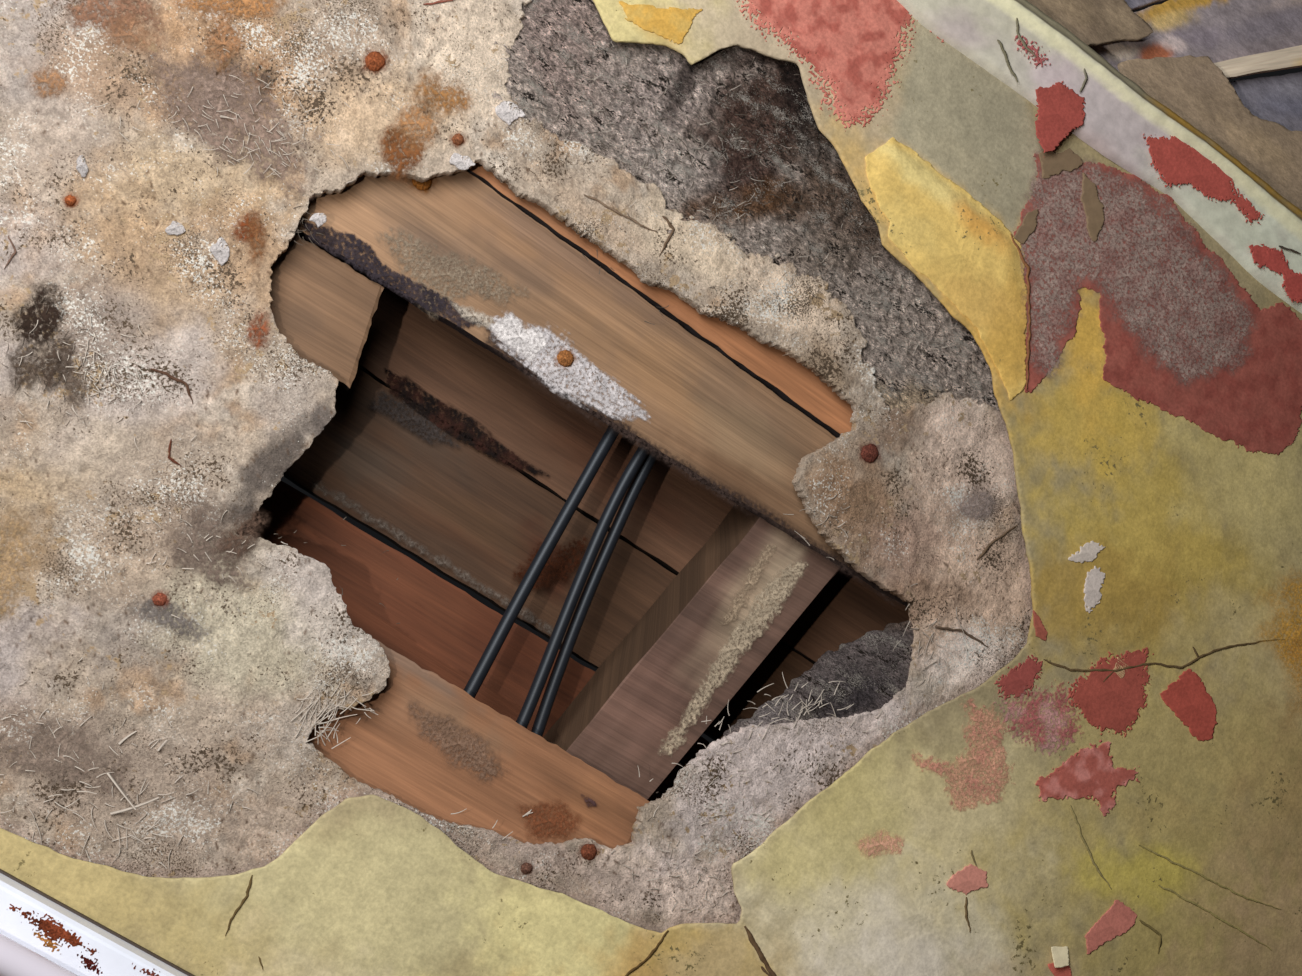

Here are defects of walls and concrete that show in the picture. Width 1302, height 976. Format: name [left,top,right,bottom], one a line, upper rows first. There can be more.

peeling [1014,81,1302,455]
mould [9,285,86,405]
spalling [0,0,1051,933]
water stain [303,222,901,603]
peeling [1068,541,1106,613]
peeling [912,647,1150,816]
crack [1044,639,1285,682]
peeling [1160,669,1218,741]
crack [625,930,669,976]
crack [744,926,777,976]